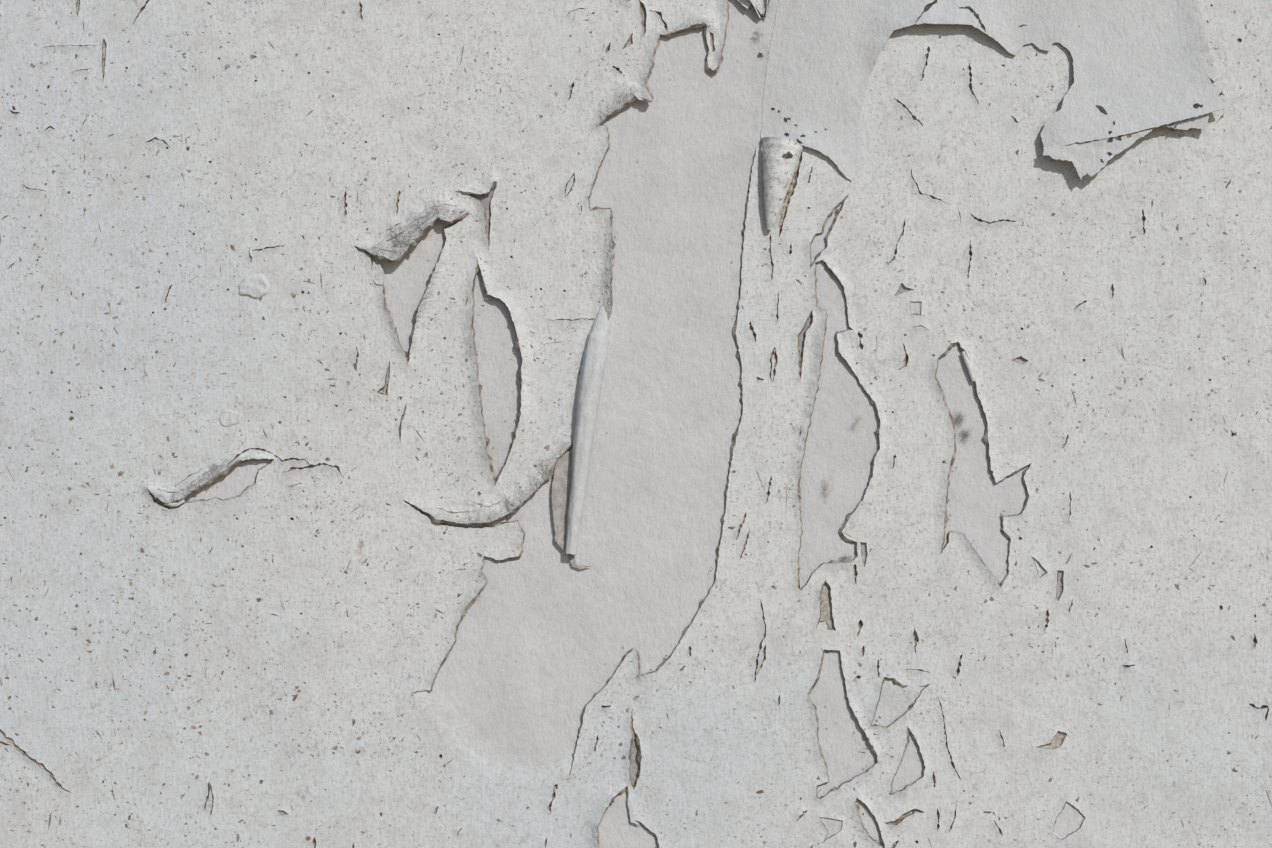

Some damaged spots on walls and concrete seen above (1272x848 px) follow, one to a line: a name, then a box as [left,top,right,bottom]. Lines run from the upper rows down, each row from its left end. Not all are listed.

peeling [347,0,1226,848]
peeling [137,444,283,516]
crack [0,729,71,793]